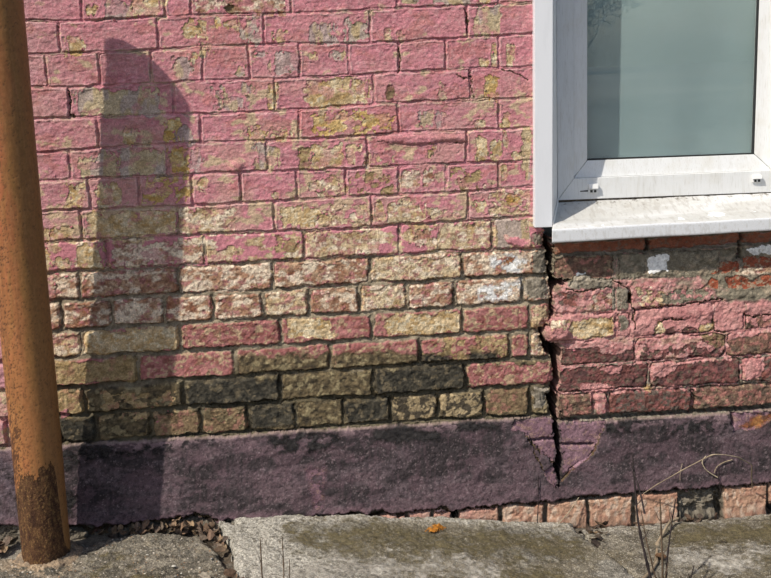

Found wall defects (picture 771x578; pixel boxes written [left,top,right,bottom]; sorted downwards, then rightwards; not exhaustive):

peeling [63,36,86,58]
peeling [85,0,169,22]
peeling [171,0,370,112]
peeling [433,0,516,103]
peeling [43,76,771,487]
crack [339,228,770,518]
water stain [306,466,326,510]